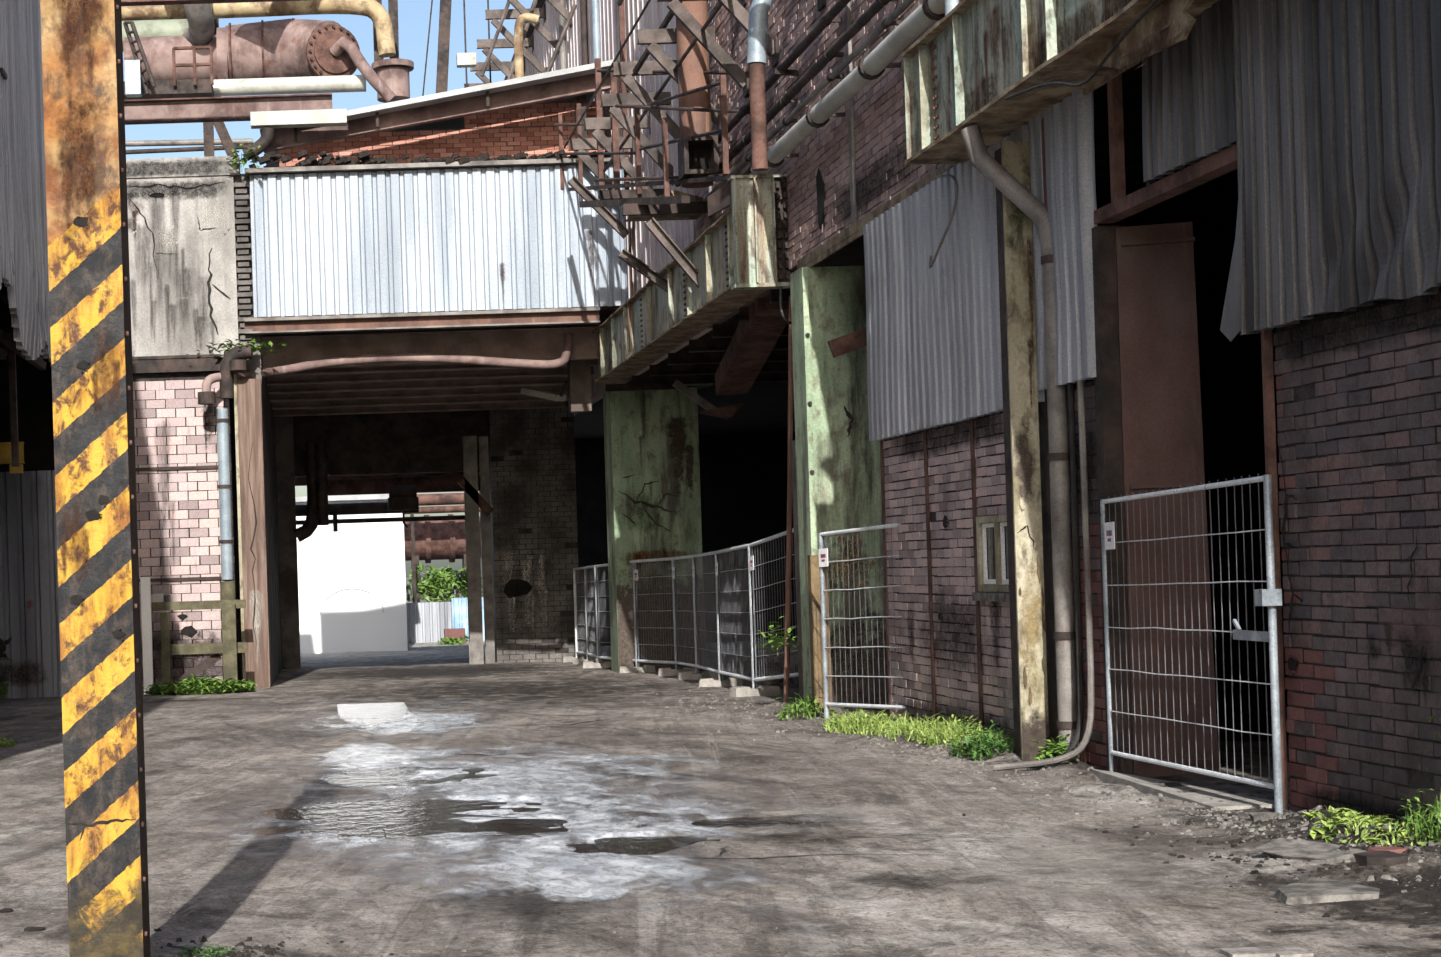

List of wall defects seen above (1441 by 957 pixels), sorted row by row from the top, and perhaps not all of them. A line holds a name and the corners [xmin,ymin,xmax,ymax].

corrosion [57,0,102,78]
corrosion [948,8,1005,119]
corrosion [1035,0,1132,69]
corrosion [60,101,94,214]
crack [127,181,230,335]
leakage [666,417,694,497]
crack [619,474,680,532]